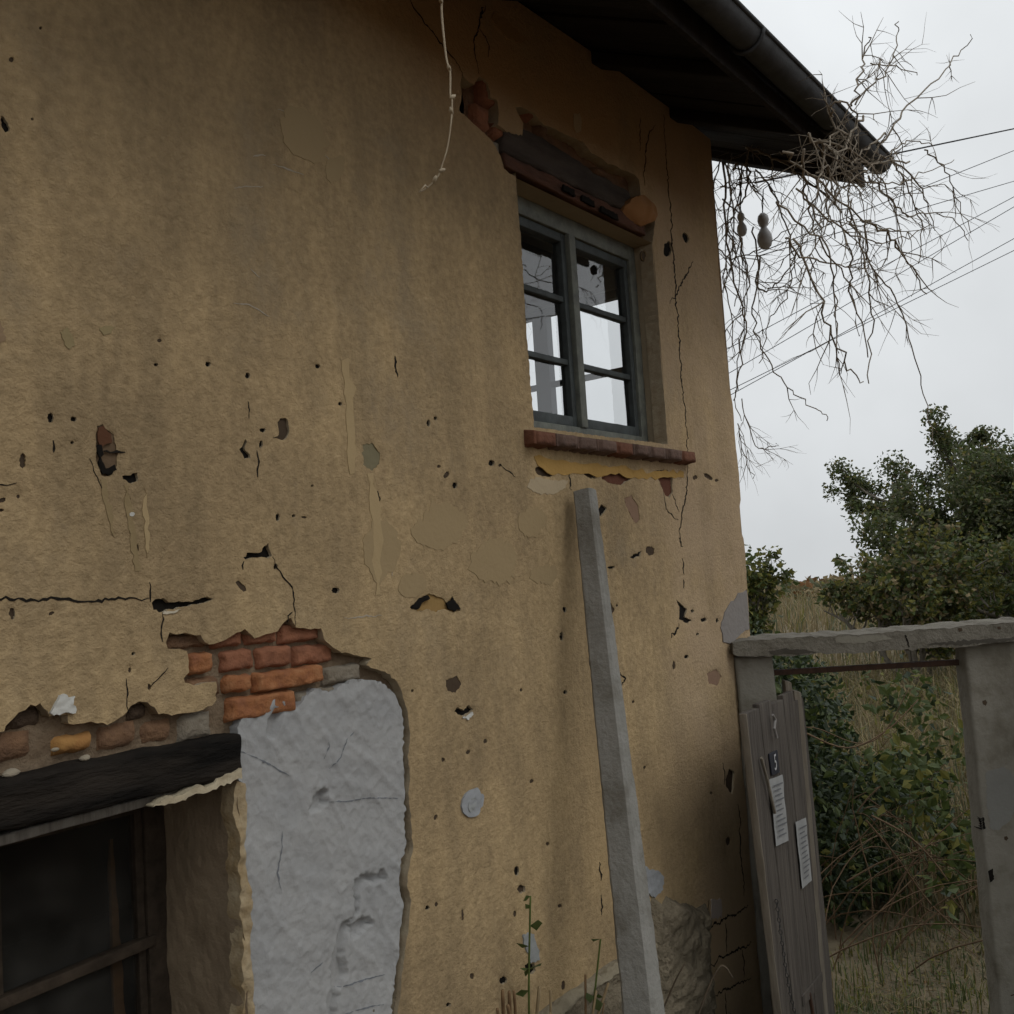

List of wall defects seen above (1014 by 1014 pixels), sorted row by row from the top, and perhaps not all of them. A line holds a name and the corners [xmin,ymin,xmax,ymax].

crack [410,0,490,76]
crack [639,114,693,588]
spalling [96,425,136,483]
crack [0,582,164,642]
crack [273,558,296,626]
spalling [410,594,461,612]
flaking render [166,623,360,723]
flaking render [0,694,77,763]
flaking render [50,703,211,756]
crack [708,806,751,1014]